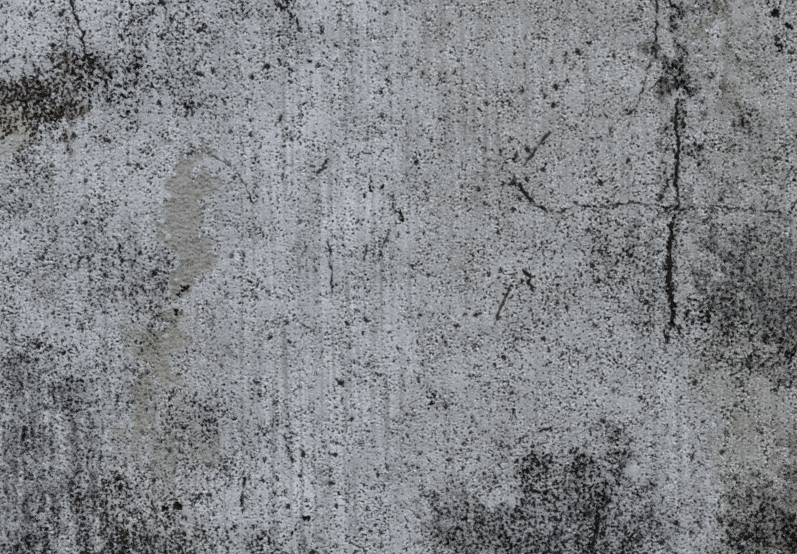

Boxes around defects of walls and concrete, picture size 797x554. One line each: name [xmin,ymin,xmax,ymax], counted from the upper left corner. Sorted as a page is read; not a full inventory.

crack [70,0,94,67]
water stain [0,0,239,213]
water stain [232,1,319,75]
crack [609,0,659,135]
crack [501,98,797,344]
water stain [402,386,797,554]